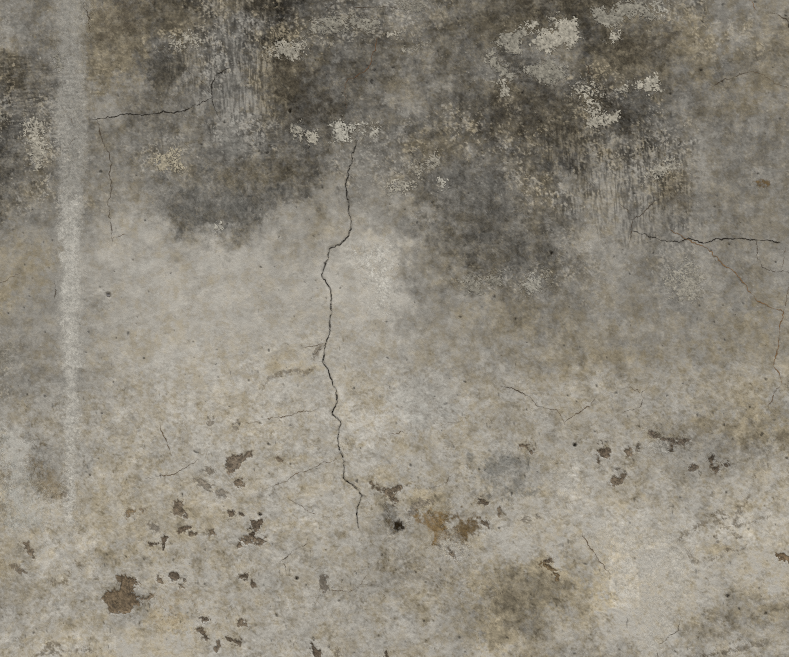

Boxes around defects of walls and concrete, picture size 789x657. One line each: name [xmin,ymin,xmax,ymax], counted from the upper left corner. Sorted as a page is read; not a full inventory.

crack [97,68,228,238]
crack [623,198,789,415]
crack [246,146,361,528]
spalling [193,466,228,498]
spalling [225,450,252,488]
spalling [369,481,403,507]
spalling [147,523,169,550]
spalling [173,499,197,536]
spalling [227,510,267,548]
spalling [102,574,154,614]
spalling [157,572,186,588]
spalling [196,617,242,653]